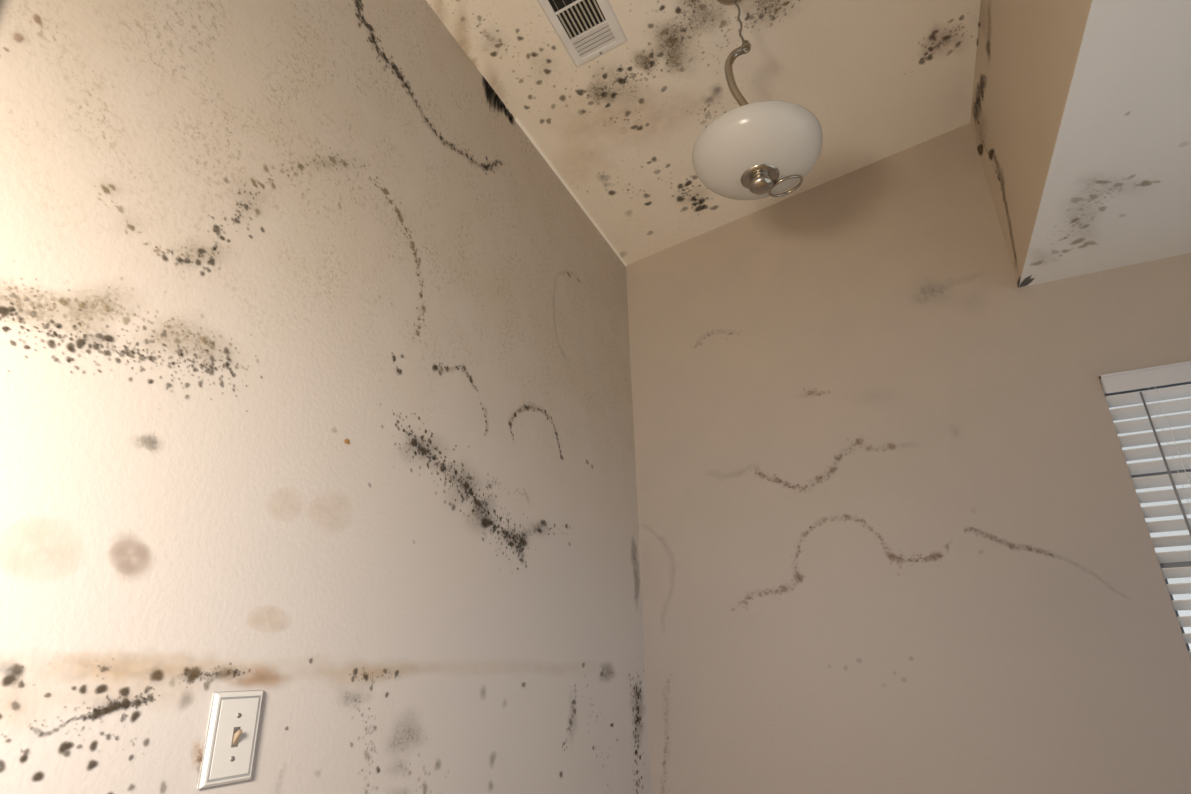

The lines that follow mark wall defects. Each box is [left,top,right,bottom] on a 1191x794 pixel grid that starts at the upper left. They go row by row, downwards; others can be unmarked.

water stain [356,0,433,126]
water stain [596,29,677,107]
crack [483,78,514,124]
water stain [678,181,707,211]
water stain [154,225,230,275]
mould [0,302,236,391]
mould [393,413,527,567]
water stain [3,666,23,687]
water stain [185,668,199,682]
water stain [72,685,155,721]
water stain [59,742,73,756]
water stain [88,734,110,769]